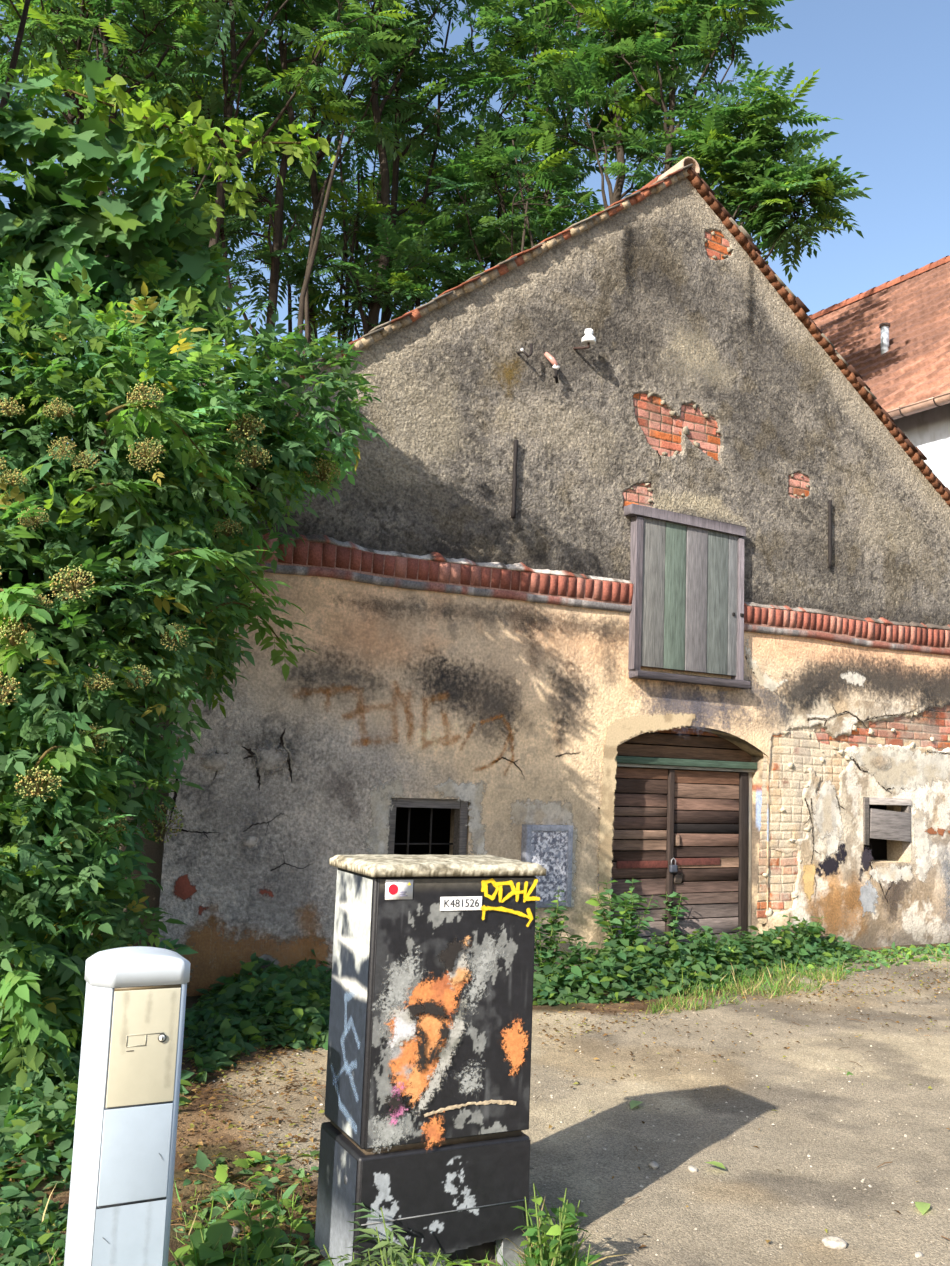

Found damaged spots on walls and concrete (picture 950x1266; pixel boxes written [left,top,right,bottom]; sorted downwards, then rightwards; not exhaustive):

spalling [705,231,734,260]
spalling [633,392,721,461]
water stain [408,659,521,739]
water stain [552,672,588,717]
water stain [642,656,950,728]
peeling [841,671,866,686]
crack [807,706,918,727]
crack [213,728,295,790]
crack [850,756,902,794]
spalling [756,704,950,924]
crack [804,788,844,903]
spalling [174,874,209,915]